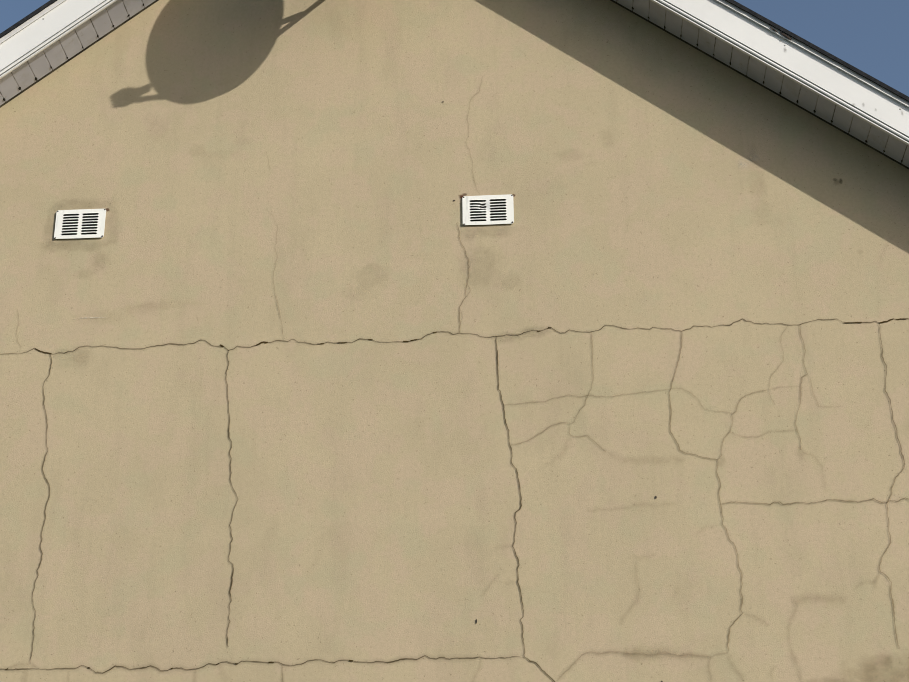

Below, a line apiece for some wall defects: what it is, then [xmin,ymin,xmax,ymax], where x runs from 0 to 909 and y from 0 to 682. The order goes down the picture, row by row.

crack [5,309,909,682]